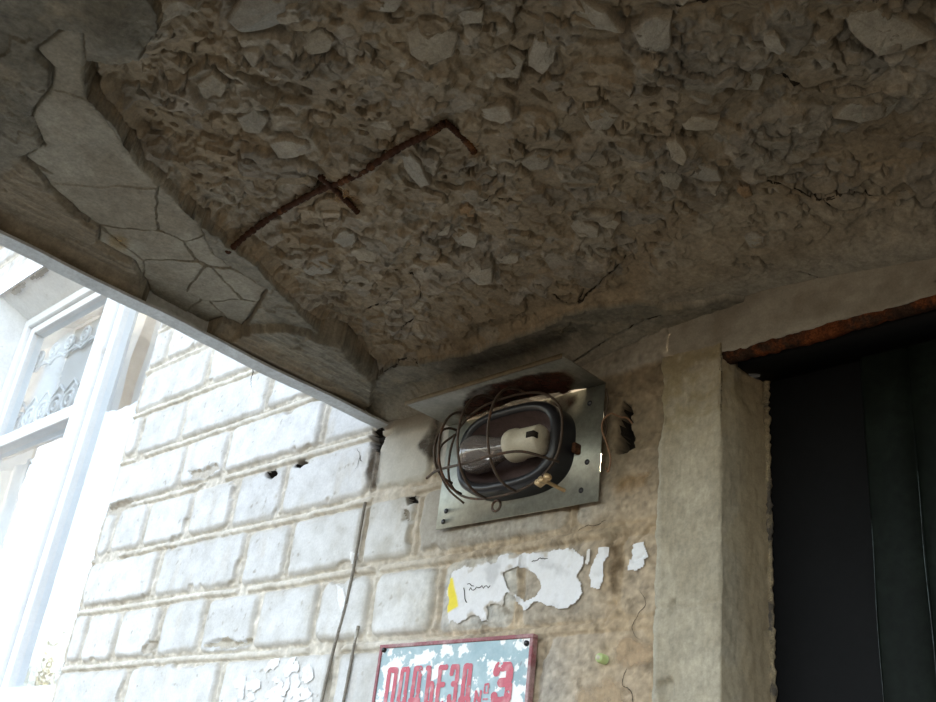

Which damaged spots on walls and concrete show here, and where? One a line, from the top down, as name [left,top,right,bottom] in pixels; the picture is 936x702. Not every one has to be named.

spalling [26,0,936,369]
peeling [232,657,314,702]